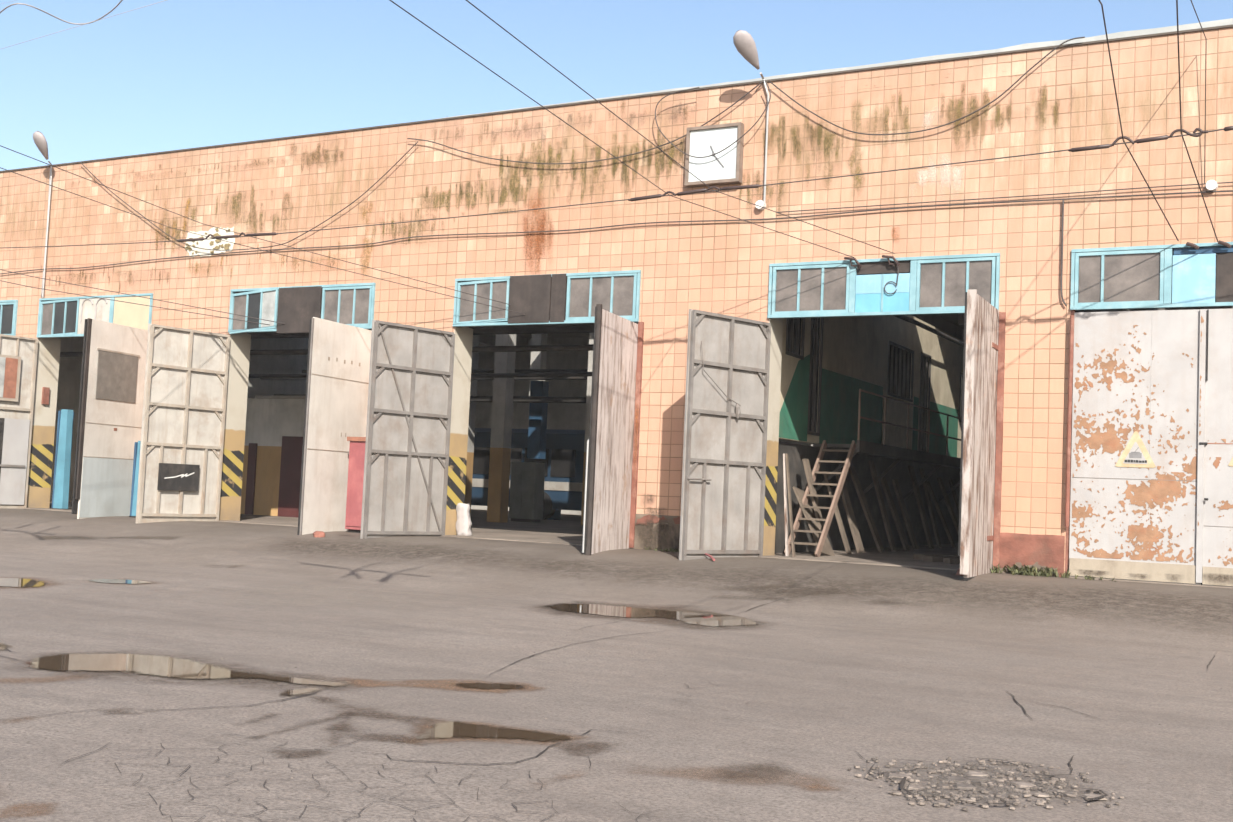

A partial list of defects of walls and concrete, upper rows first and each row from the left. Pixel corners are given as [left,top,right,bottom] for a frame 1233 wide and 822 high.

water stain [426,146,616,208]
peeling [1071,325,1233,566]
crack [62,687,666,822]